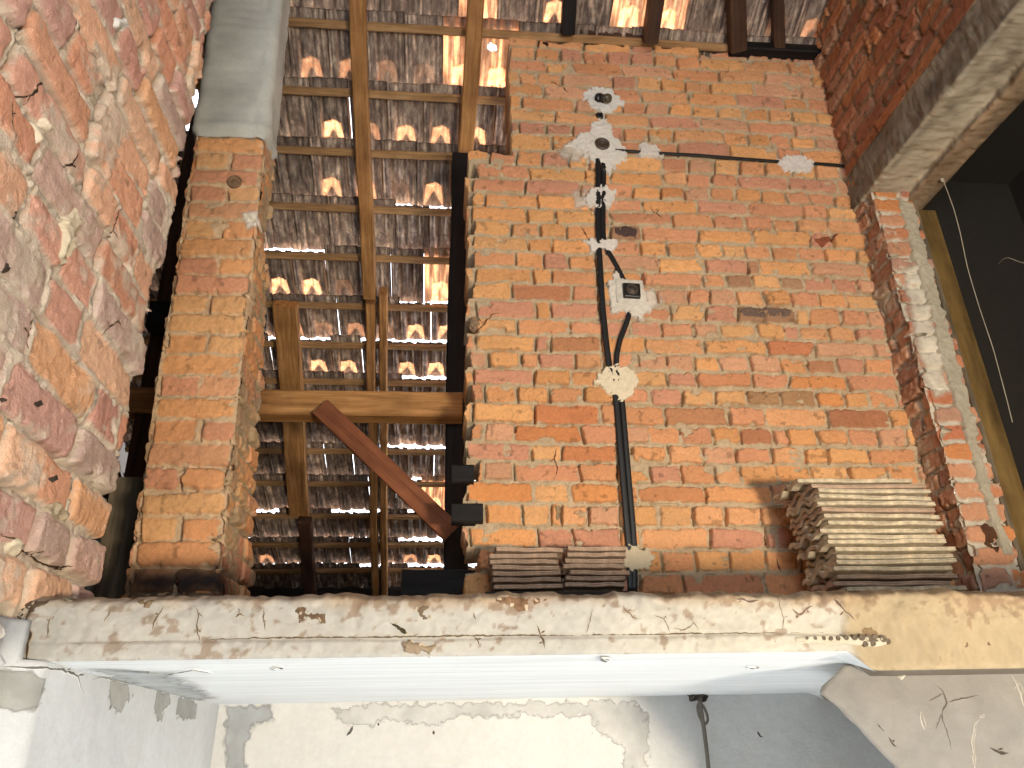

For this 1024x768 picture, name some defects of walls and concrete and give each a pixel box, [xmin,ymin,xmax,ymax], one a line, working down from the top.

crack [11,82,43,142]
flaking render [295,607,326,624]
flaking render [495,591,547,612]
flaking render [391,622,436,658]
peeling [109,679,134,715]
peeling [154,691,197,722]
peeling [223,704,274,768]
peeling [334,699,650,768]
crack [920,682,1008,768]